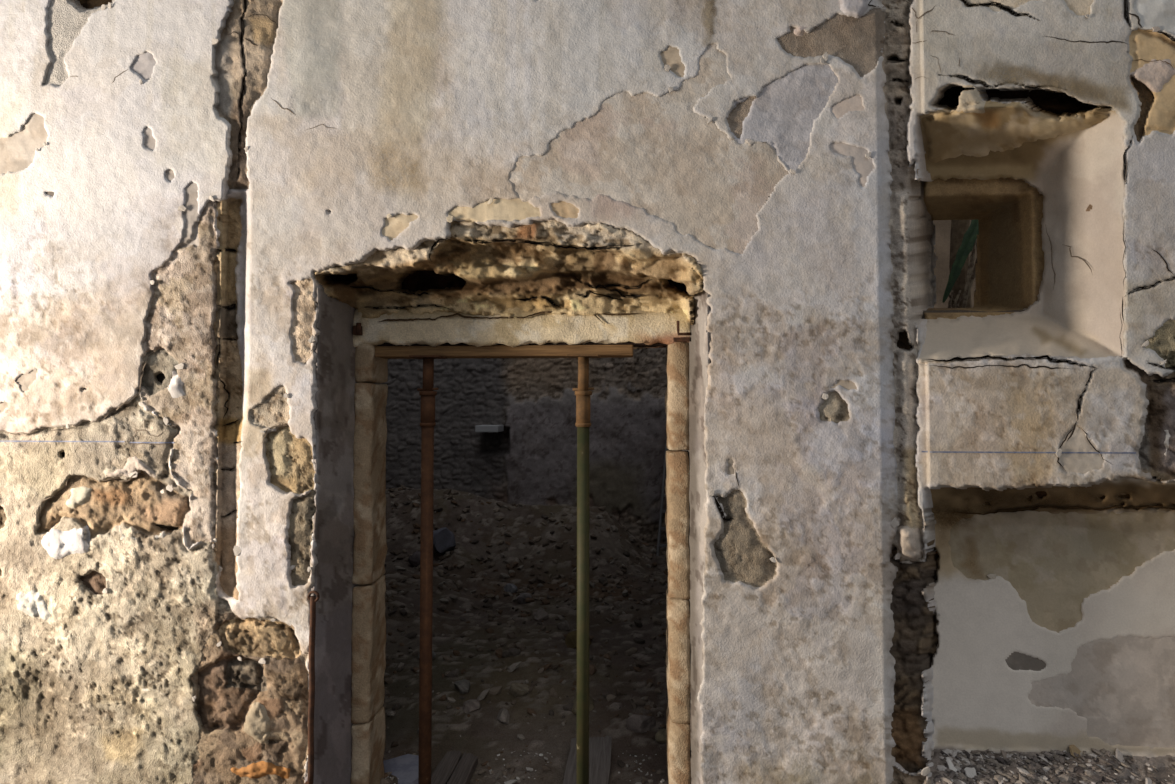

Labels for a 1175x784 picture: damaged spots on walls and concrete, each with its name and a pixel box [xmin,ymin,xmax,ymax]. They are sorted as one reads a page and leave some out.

crack [228,0,336,185]
flaking render [727,6,899,174]
crack [1123,136,1133,185]
flaking render [1129,0,1175,142]
spalling [290,198,704,364]
crack [1119,213,1175,356]
spalling [0,182,316,784]
spalling [709,489,777,587]
crack [925,355,1110,471]
crack [942,505,1175,515]
flaking render [948,491,1175,633]
crack [1149,363,1175,383]